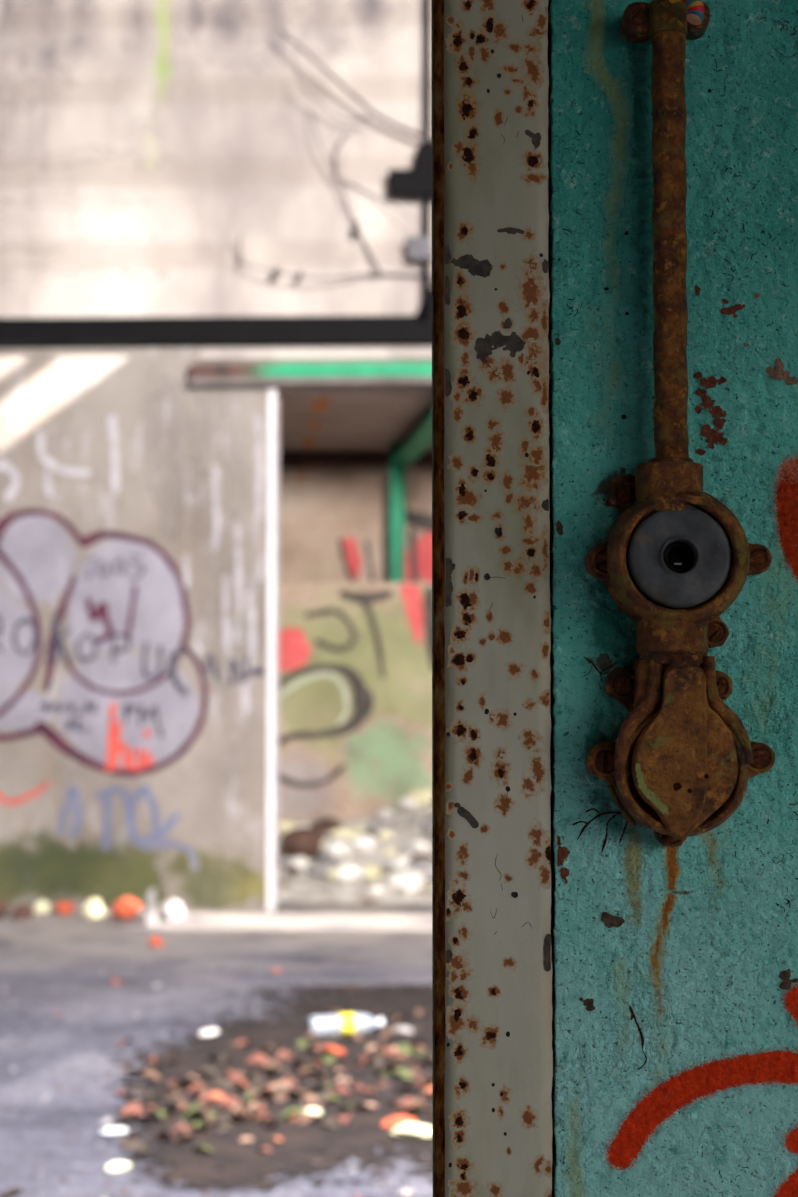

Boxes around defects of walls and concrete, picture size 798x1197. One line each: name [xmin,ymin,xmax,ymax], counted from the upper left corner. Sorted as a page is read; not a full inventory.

corrosion [445,0,548,187]
corrosion [452,219,476,246]
peeling [445,245,497,305]
peeling [475,317,526,363]
peeling [766,356,797,385]
peeling [693,372,728,456]
corrosion [590,466,627,502]
corrosion [446,225,552,1197]
corrosion [605,816,734,1093]